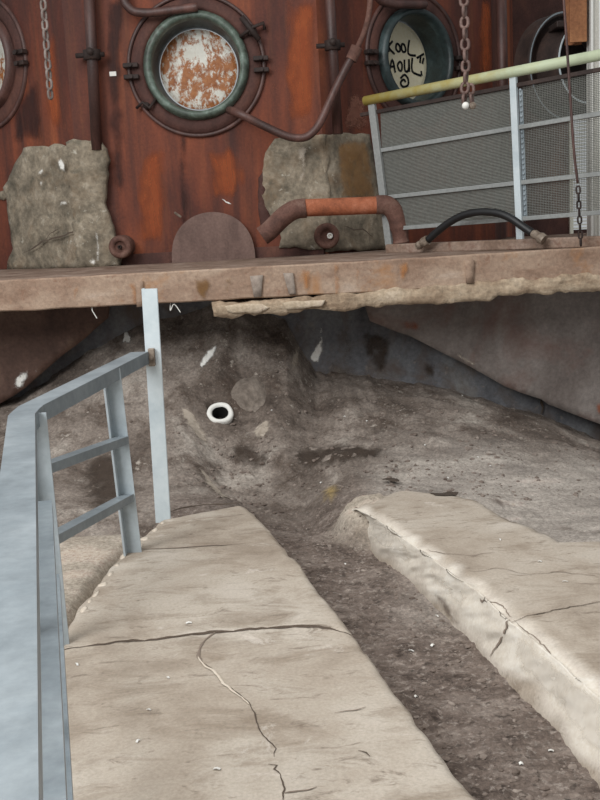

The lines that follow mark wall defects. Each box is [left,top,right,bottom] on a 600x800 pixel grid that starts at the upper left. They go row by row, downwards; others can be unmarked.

crack [64,624,351,798]
crack [480,599,596,657]